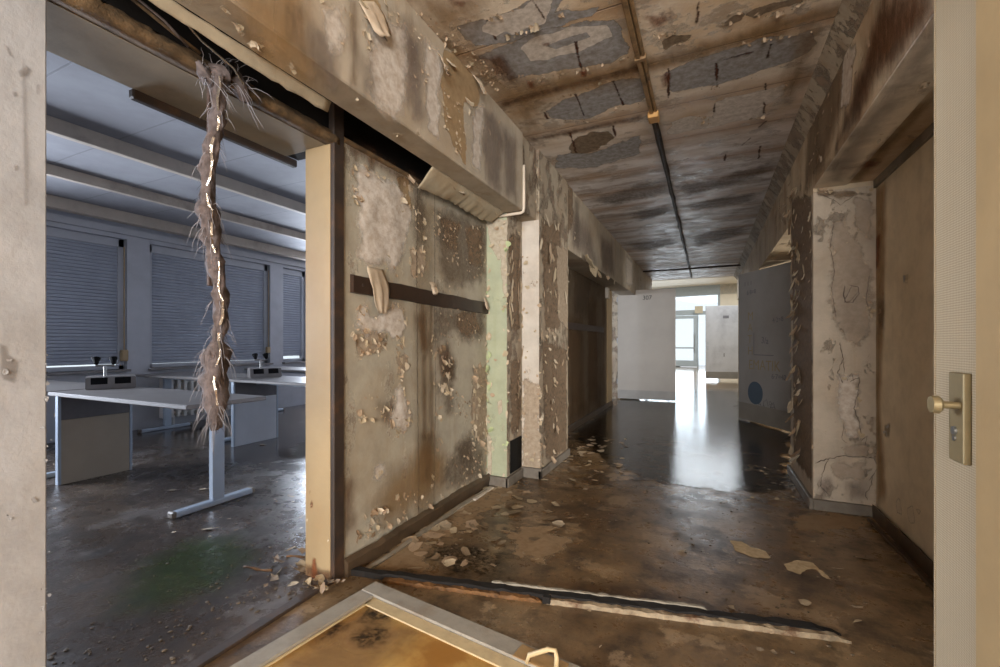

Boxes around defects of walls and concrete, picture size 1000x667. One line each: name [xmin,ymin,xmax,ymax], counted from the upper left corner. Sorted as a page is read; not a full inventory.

water stain [412,2,623,136]
spalling [437,0,630,165]
water stain [534,117,639,140]
spalling [653,31,691,50]
spalling [665,30,817,134]
spalling [722,0,806,26]
peeling [350,261,411,380]
peeling [397,176,450,295]
peeling [431,78,645,478]
peeling [785,46,874,480]
crack [830,224,876,318]
crack [812,344,877,498]